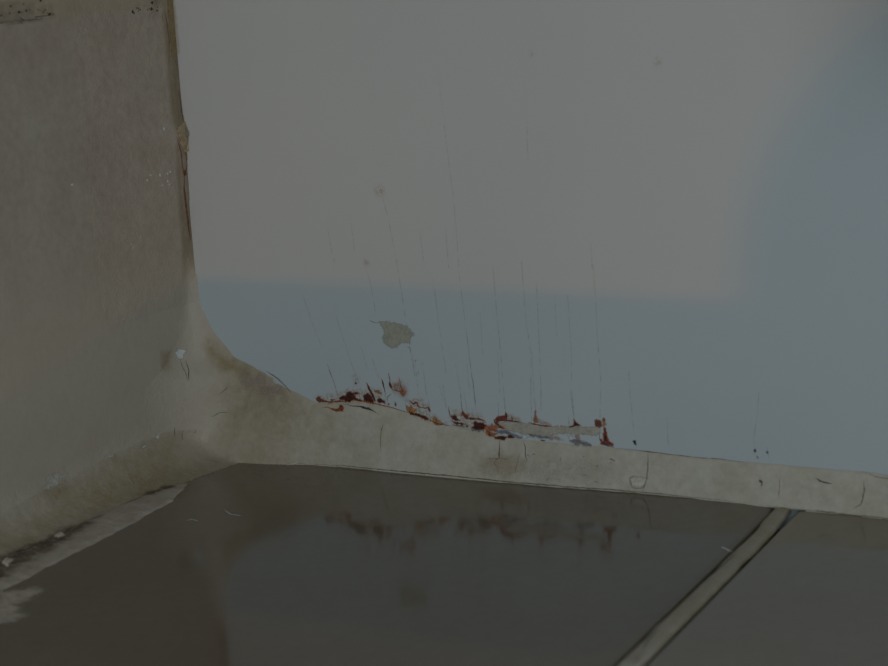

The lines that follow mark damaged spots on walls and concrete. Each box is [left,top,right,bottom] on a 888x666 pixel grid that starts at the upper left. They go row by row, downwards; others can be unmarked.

peeling [370,320,413,352]
corrosion [316,373,580,440]
peeling [498,422,600,446]
corrosion [594,418,614,447]